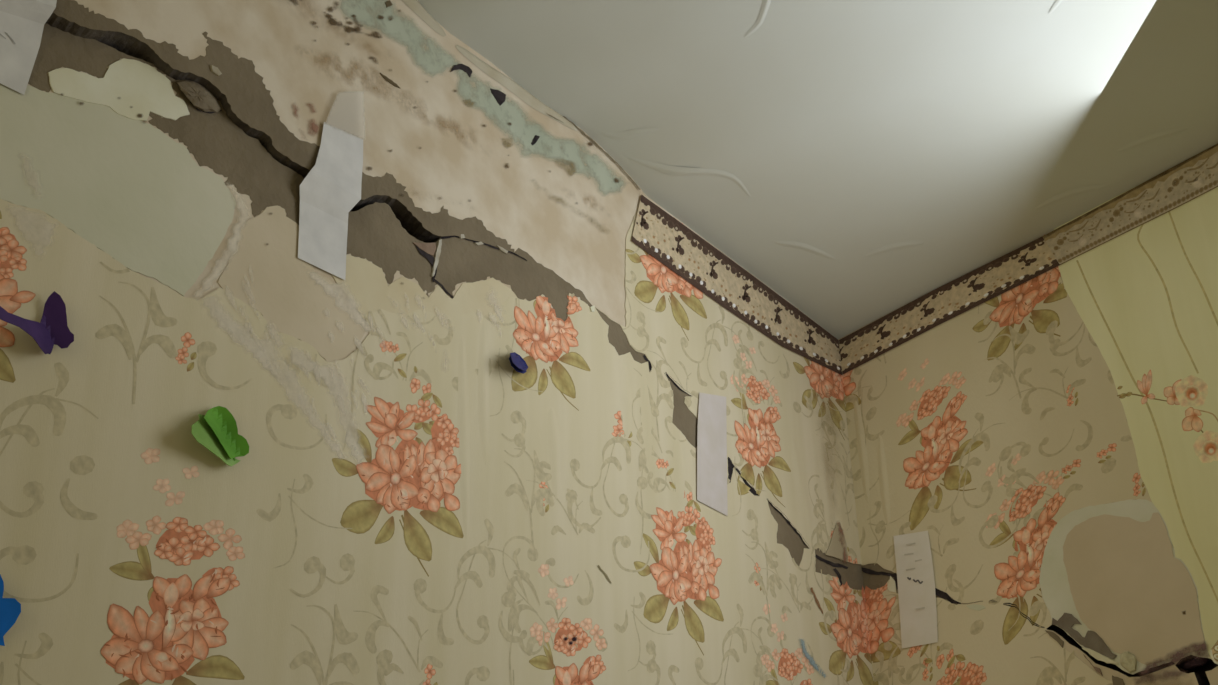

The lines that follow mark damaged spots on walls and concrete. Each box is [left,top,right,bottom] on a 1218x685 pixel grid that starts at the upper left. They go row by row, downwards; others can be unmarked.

leakage [312,3,400,45]
crack [46,13,310,178]
crack [548,114,640,190]
peeling [0,0,624,461]
crack [350,195,527,298]
crack [727,457,898,592]
crack [935,588,1175,685]
peeling [1039,499,1218,685]